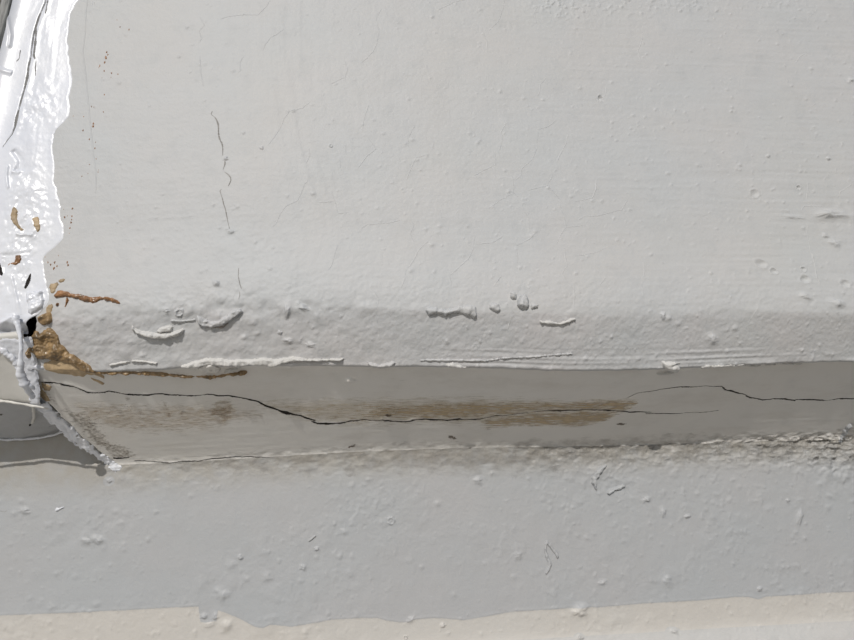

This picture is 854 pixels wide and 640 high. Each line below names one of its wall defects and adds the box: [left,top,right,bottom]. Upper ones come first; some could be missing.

rust [11,207,40,232]
rust [25,278,247,385]
crack [42,382,854,425]
leakage [355,401,637,426]
crack [113,455,270,463]